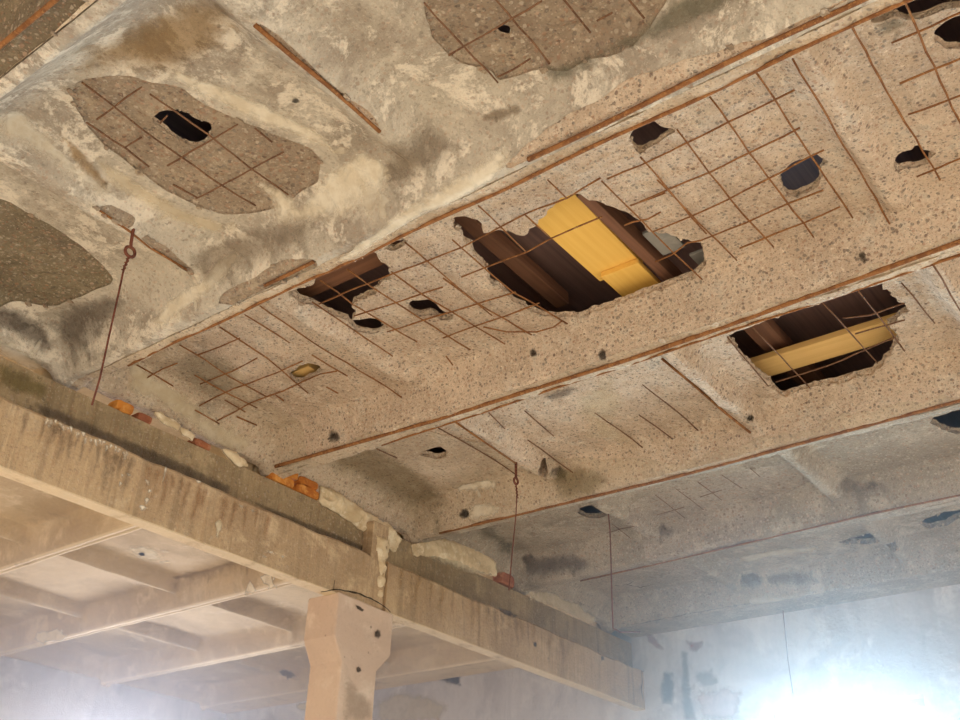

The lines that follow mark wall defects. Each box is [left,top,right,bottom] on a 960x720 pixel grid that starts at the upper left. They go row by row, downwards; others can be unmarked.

spalling [0,199,113,308]
damp [46,418,128,459]
spalling [67,76,323,215]
rust [127,0,914,367]
spalling [182,0,960,479]
rust [274,239,960,468]